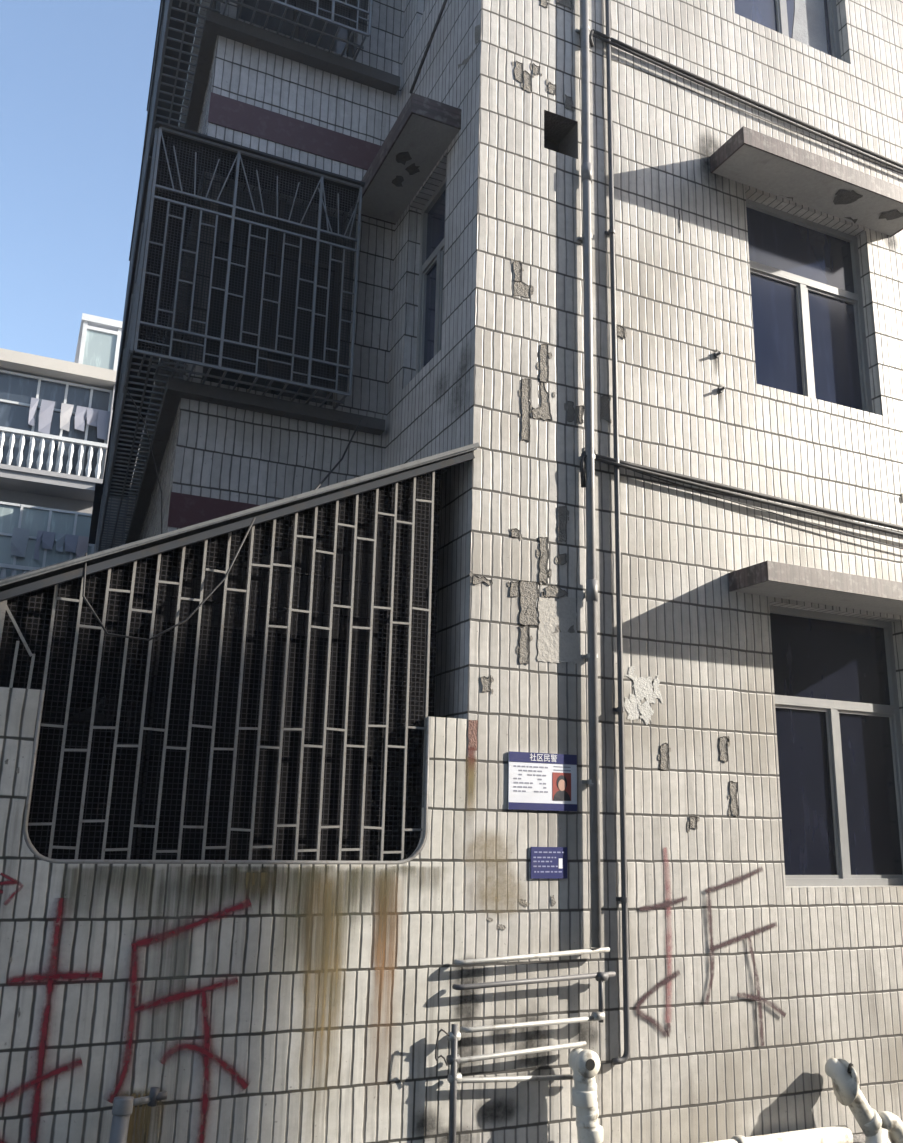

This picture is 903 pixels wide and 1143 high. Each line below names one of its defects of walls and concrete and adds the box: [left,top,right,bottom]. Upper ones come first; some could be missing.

spalling [540,0,574,10]
spalling [512,61,575,112]
peeling [833,190,863,223]
peeling [879,210,903,220]
spalling [511,259,534,298]
spalling [519,344,585,442]
spalling [601,395,612,423]
peeling [507,506,586,664]
spalling [481,675,494,694]
peeling [624,666,663,725]
corrosion [468,720,478,803]
corrosion [375,879,396,998]